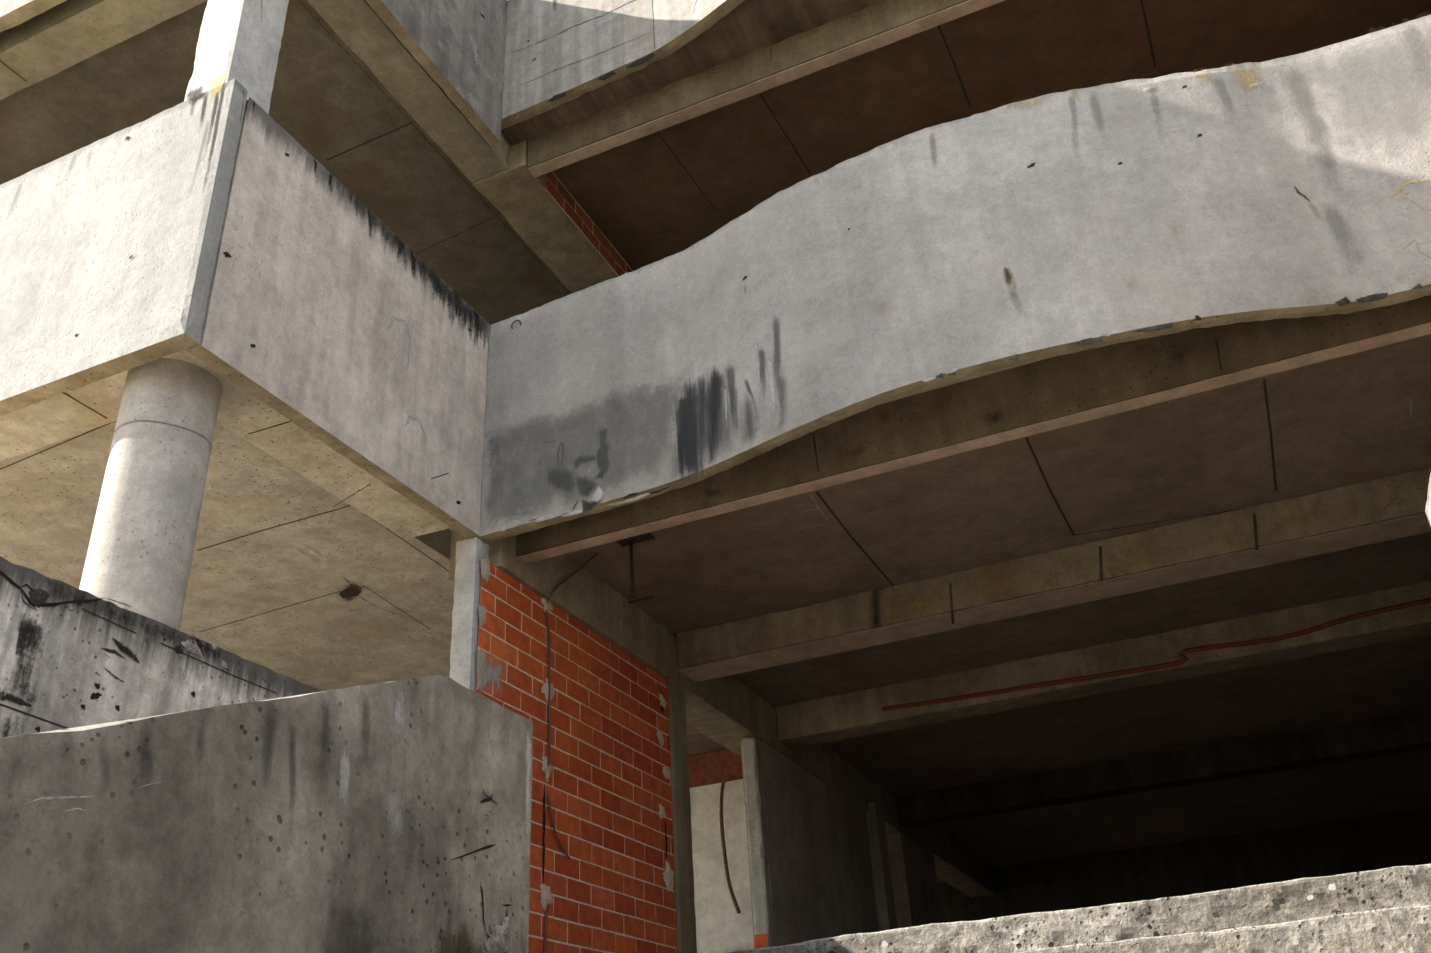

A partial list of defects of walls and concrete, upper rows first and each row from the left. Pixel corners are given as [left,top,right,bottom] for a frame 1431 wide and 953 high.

leakage [186,83,225,190]
leakage [314,159,486,343]
leakage [677,326,779,475]
crack [0,571,133,611]